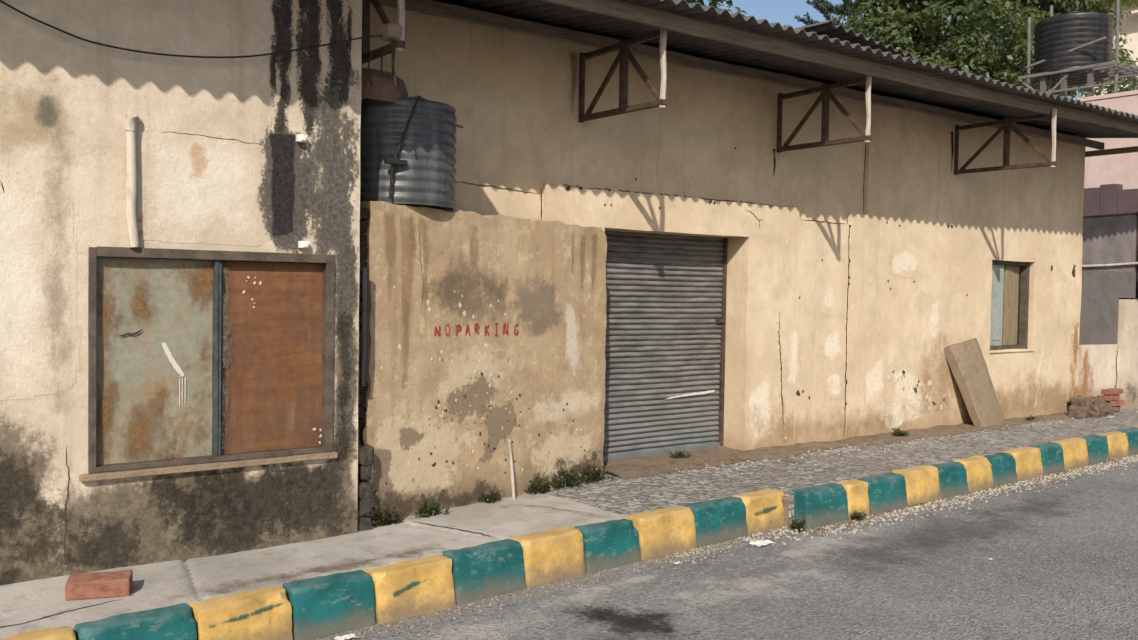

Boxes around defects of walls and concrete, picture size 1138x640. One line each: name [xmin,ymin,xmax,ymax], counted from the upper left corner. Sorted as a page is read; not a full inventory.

crack [159,131,263,146]
leakage [259,0,353,253]
corrosion [185,261,213,305]
crack [456,110,867,446]
corrosion [96,381,118,454]
corrosion [124,393,180,461]
leakage [0,234,359,586]
spalling [871,362,948,433]